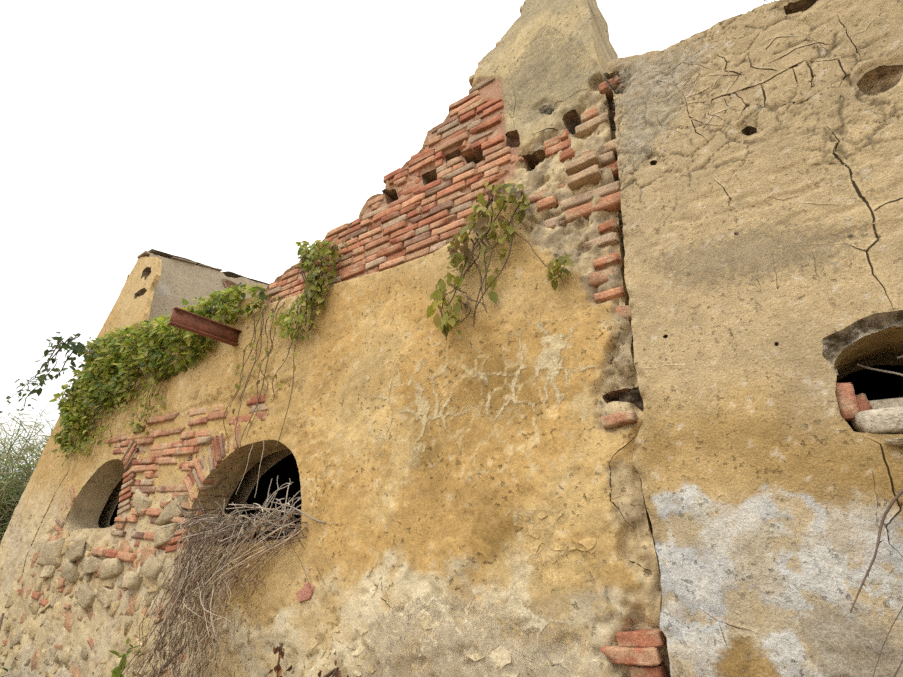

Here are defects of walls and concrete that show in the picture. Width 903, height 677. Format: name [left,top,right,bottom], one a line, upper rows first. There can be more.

flaking render [784,0,818,15]
flaking render [602,68,632,94]
crack [629,14,876,141]
flaking render [857,65,903,96]
spalling [505,130,520,148]
flaking render [538,105,582,135]
crack [535,78,620,181]
crack [616,212,625,253]
crack [771,126,903,309]
damp [364,321,598,460]
crack [619,348,686,410]